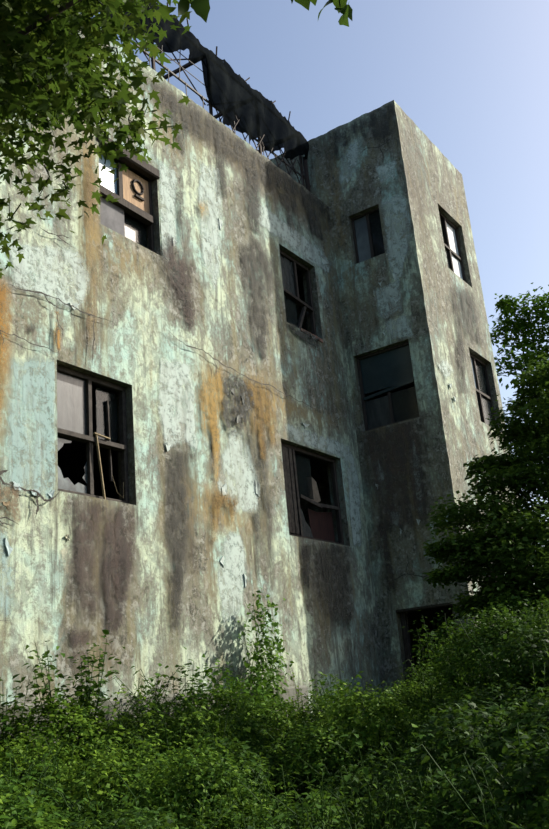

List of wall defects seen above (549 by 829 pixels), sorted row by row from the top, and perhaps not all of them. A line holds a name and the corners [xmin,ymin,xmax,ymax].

leakage [154,82,329,359]
crack [0,284,117,365]
corrosion [201,371,225,478]
crack [0,470,60,526]
leakage [71,499,134,631]
leakage [166,450,195,627]
leakage [301,544,351,627]